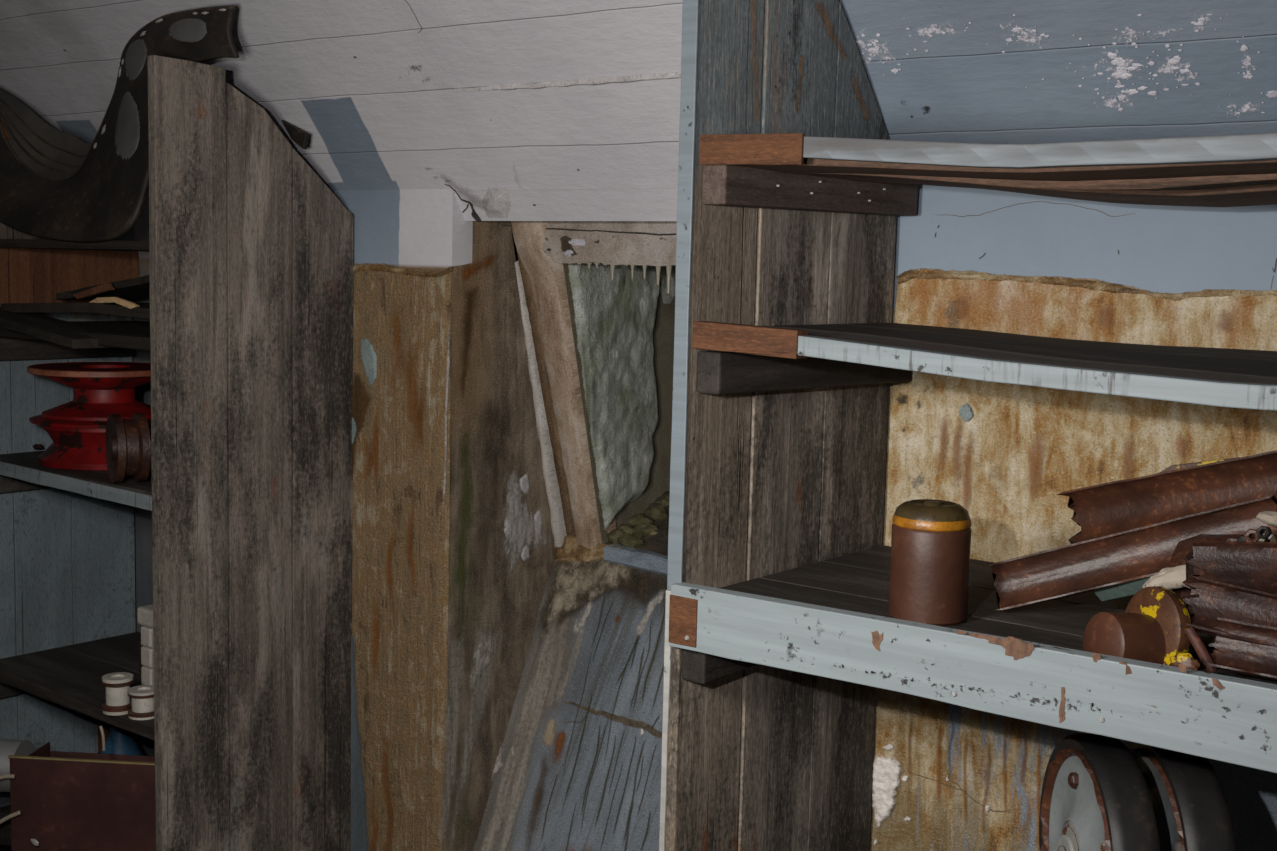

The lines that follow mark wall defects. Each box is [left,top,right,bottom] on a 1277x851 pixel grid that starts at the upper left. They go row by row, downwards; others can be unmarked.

peeling [816,3,971,76]
peeling [1000,14,1049,53]
peeling [1067,14,1229,111]
peeling [1206,91,1277,117]
peeling [1237,36,1260,79]
water stain [893,268,1277,351]
water stain [569,264,675,528]
water stain [882,371,1277,563]
water stain [482,535,665,851]
crack [566,701,662,738]
water stain [865,671,1101,851]
water stain [1207,758,1277,851]